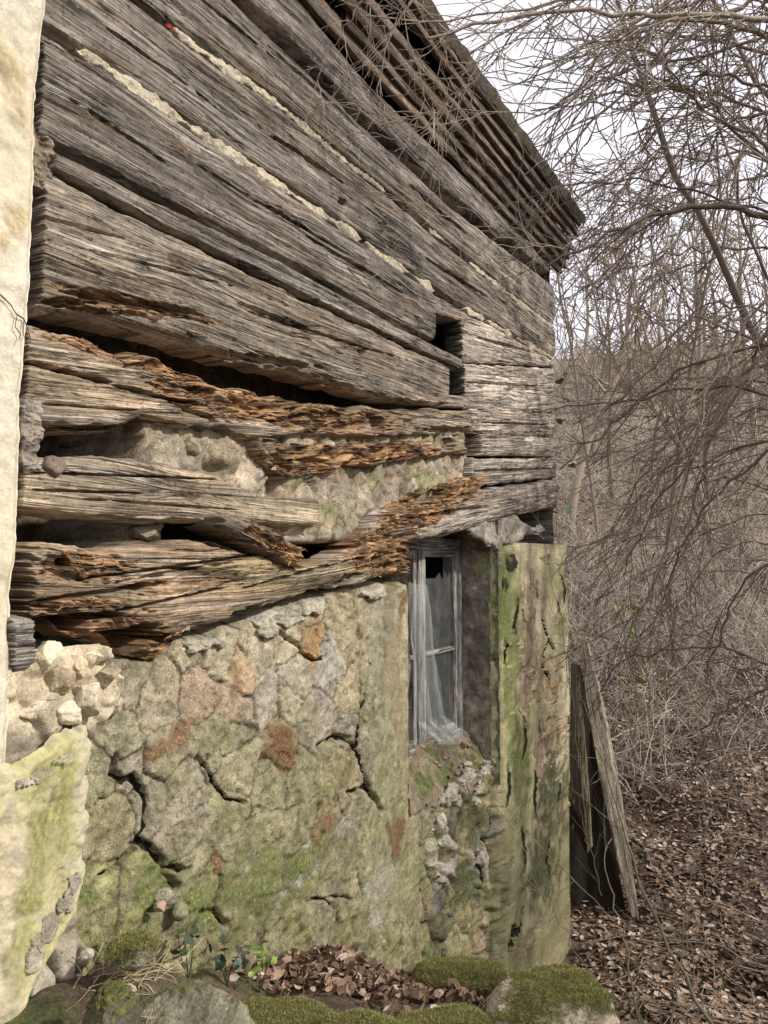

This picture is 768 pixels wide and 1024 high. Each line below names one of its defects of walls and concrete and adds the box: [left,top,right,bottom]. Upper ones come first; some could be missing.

crack [504,574,566,678]
flaking render [19,640,124,725]
crack [97,773,182,884]
crack [200,764,241,803]
crack [315,693,373,801]
spalling [424,759,495,887]
crack [474,724,561,890]
crack [202,884,220,923]
crack [310,895,347,906]
crack [508,918,522,952]